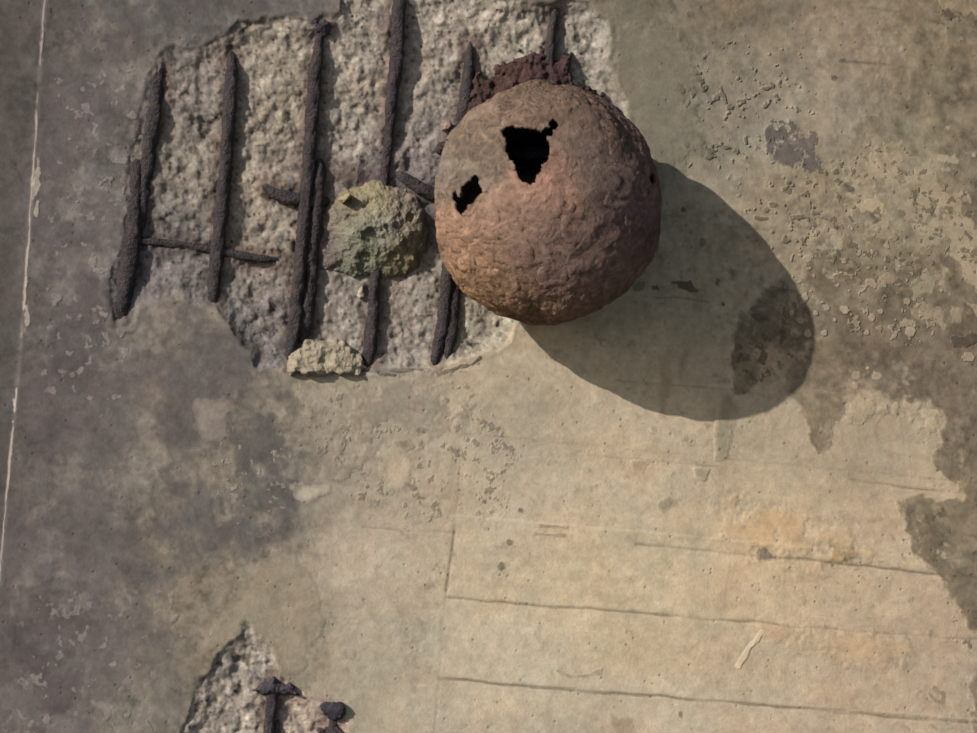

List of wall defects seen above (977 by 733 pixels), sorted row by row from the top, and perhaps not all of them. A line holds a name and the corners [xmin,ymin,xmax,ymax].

rust [313,19,333,38]
rust [340,150,434,204]
water stain [803,139,977,331]
spalling [114,0,617,524]
rust [425,358,452,384]
water stain [845,397,944,442]
spalling [176,629,359,733]
rust [252,676,300,696]
rust [317,701,346,733]